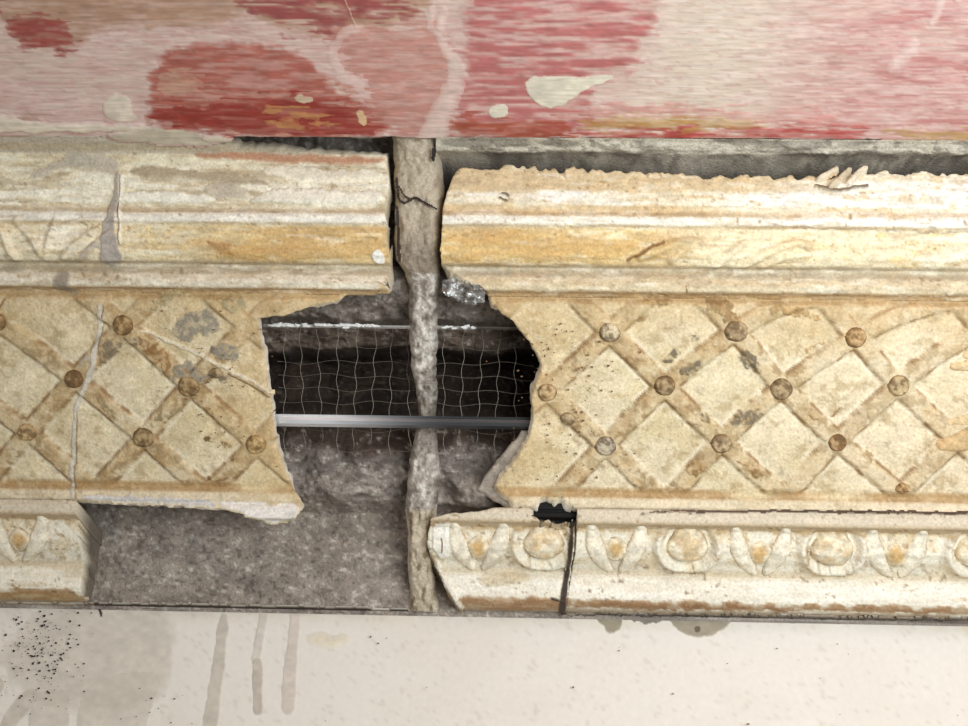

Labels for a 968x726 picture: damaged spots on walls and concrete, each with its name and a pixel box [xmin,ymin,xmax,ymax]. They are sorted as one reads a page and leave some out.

crack [78,172,124,265]
peeling [98,291,248,385]
crack [69,302,106,500]
peeling [203,435,233,448]
peeling [81,494,300,525]
crack [641,508,968,516]
peeling [431,522,465,609]
crack [550,521,968,625]
leakage [0,609,183,726]
leakage [191,613,230,726]
leakage [251,613,269,716]
leakage [281,613,351,715]